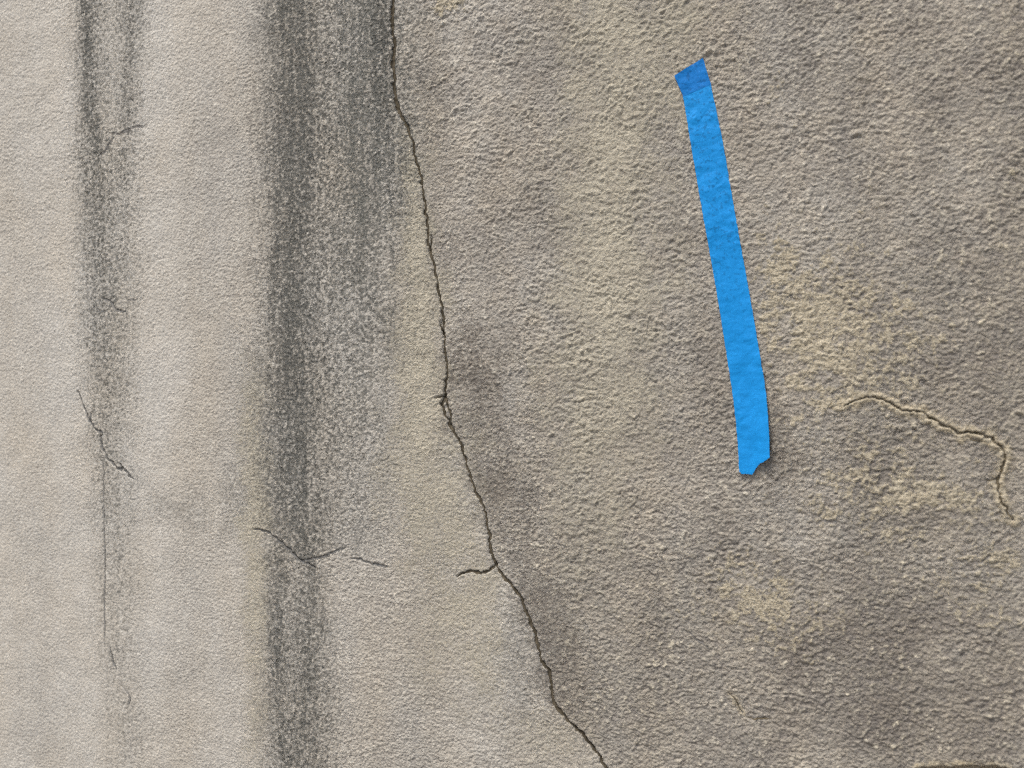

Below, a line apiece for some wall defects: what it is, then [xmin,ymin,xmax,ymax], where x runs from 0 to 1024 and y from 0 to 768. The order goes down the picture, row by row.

leakage [78,0,125,269]
crack [78,391,132,704]
crack [255,529,387,567]
leakage [238,0,502,768]
crack [390,0,608,768]
crack [838,391,1020,527]